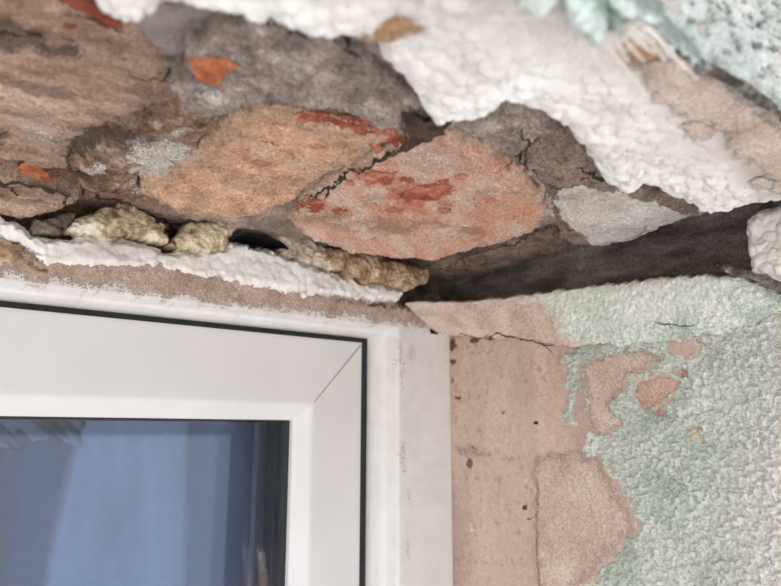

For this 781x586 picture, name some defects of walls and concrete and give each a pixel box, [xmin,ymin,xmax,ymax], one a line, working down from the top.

spalling [61,0,124,29]
spalling [188,55,240,92]
spalling [0,158,87,189]
crack [300,149,398,201]
spalling [292,110,411,154]
crack [505,129,541,176]
crack [576,167,623,194]
crack [0,180,209,237]
crack [459,332,553,355]
flaking render [582,350,660,438]
flaking render [636,368,689,417]
flaking render [522,450,633,586]